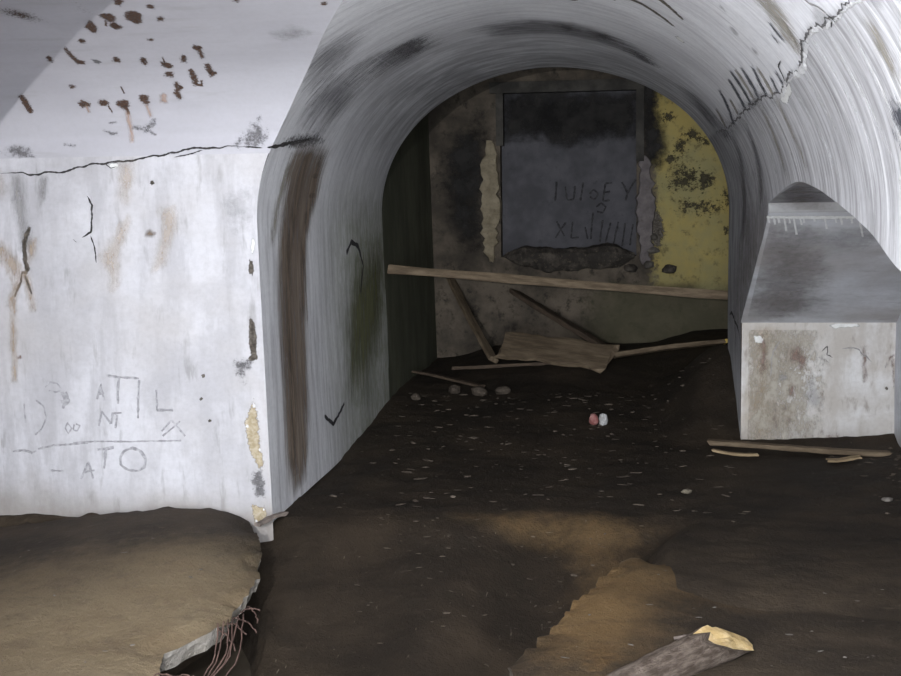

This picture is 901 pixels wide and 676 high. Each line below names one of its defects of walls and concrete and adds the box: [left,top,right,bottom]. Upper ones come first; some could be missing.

rust [77,0,165,43]
rust [18,95,33,113]
rust [64,47,101,65]
rust [78,87,133,140]
rust [161,44,217,102]
crack [716,0,863,134]
damp [848,27,901,149]
crack [1,138,314,176]
damp [665,127,729,218]
spalling [244,403,263,469]
spalling [158,539,262,676]